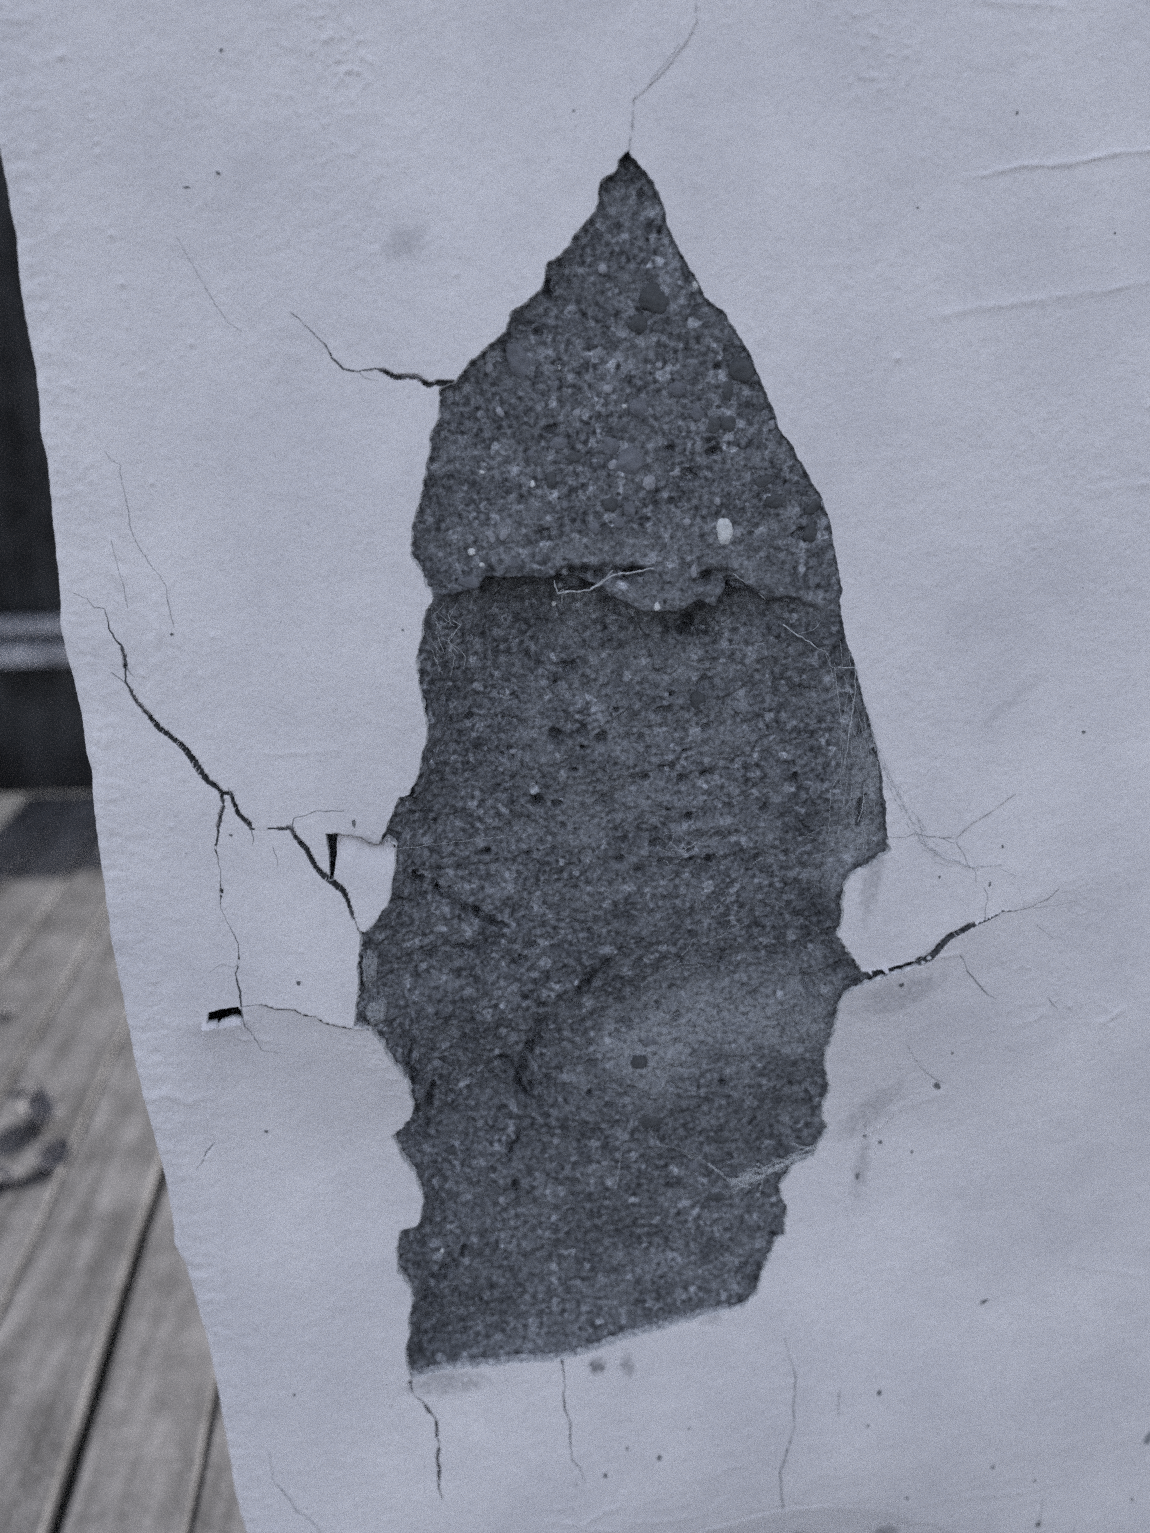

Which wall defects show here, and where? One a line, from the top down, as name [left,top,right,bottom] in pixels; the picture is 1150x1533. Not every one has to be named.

crack [629,7,697,147]
crack [291,312,454,387]
crack [74,452,359,1053]
spalling [325,150,932,1379]
crack [891,795,1077,999]
spalling [209,1007,243,1022]